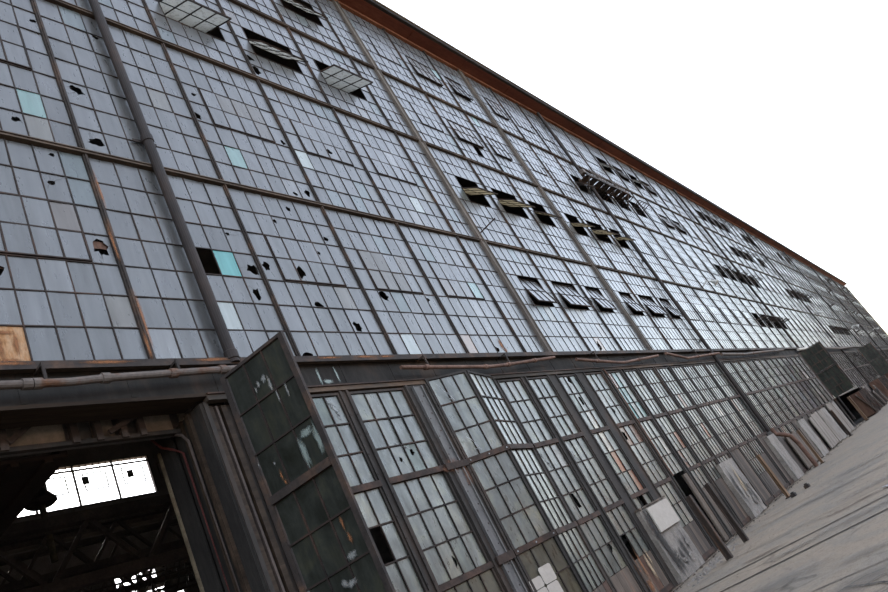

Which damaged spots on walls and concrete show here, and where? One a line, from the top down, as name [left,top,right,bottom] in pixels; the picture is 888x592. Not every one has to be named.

rust [0,331,23,365]
peeling [298,425,323,464]